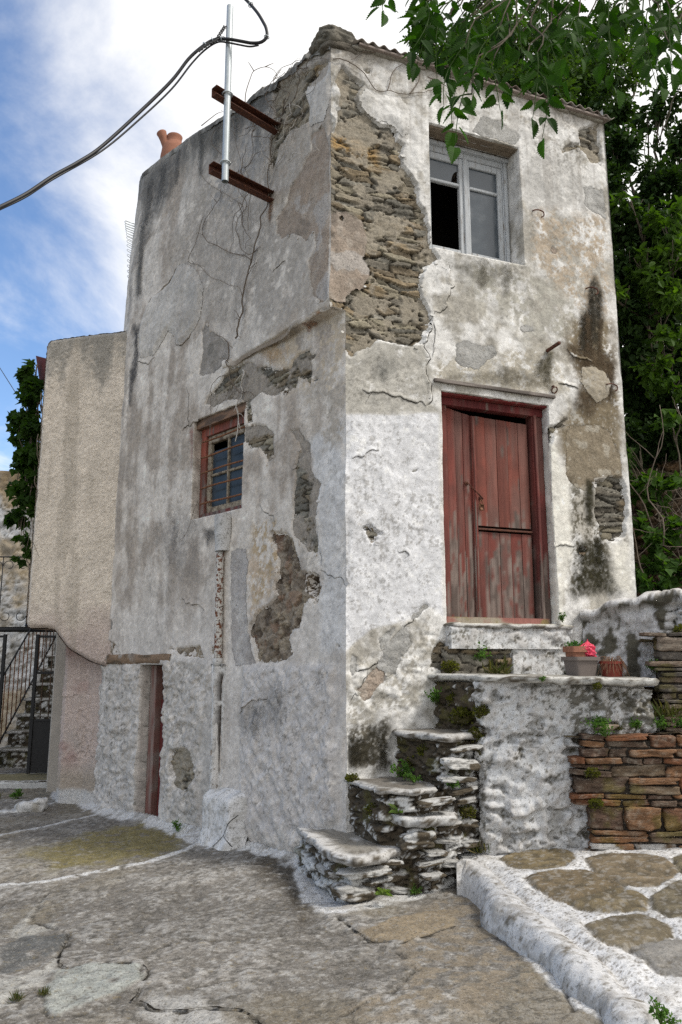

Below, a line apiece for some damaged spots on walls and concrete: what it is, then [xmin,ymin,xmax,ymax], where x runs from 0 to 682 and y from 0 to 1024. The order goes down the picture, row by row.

flaking render [562,126,602,165]
flaking render [270,62,438,356]
flaking render [199,321,318,466]
crack [363,262,455,406]
damp [576,391,595,413]
damp [569,277,614,399]
flaking render [548,416,625,541]
flaking render [251,429,322,663]
flaking render [350,655,391,701]
flaking render [168,747,195,793]